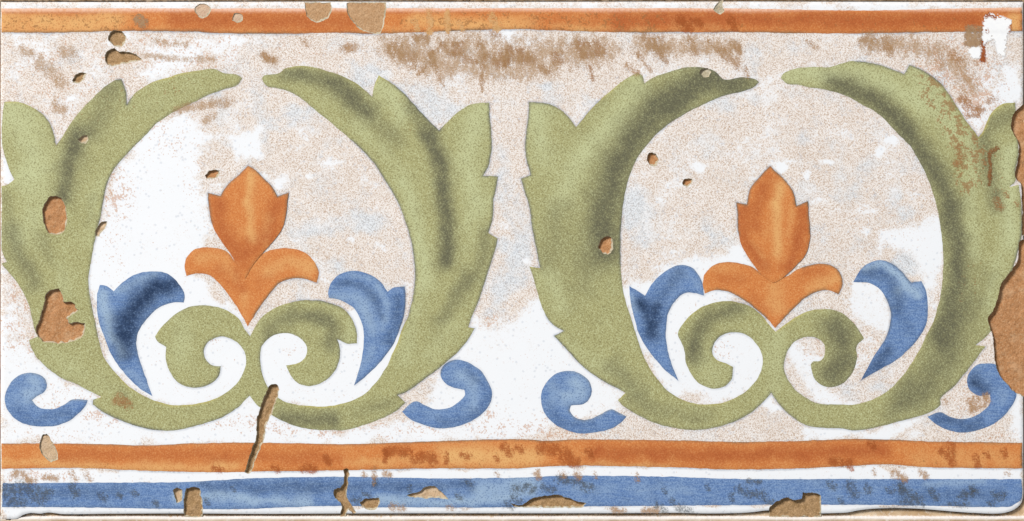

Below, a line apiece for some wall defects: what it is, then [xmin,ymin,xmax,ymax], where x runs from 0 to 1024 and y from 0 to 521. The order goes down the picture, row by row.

peeling [347,2,387,34]
peeling [950,13,1012,61]
peeling [42,196,67,235]
peeling [988,104,1024,397]
peeling [36,288,85,344]
peeling [39,434,58,462]
crack [245,384,279,474]
peeling [173,487,203,517]
crack [333,468,356,517]
peeling [407,486,449,500]
peeling [511,495,586,508]
peeling [769,492,821,517]